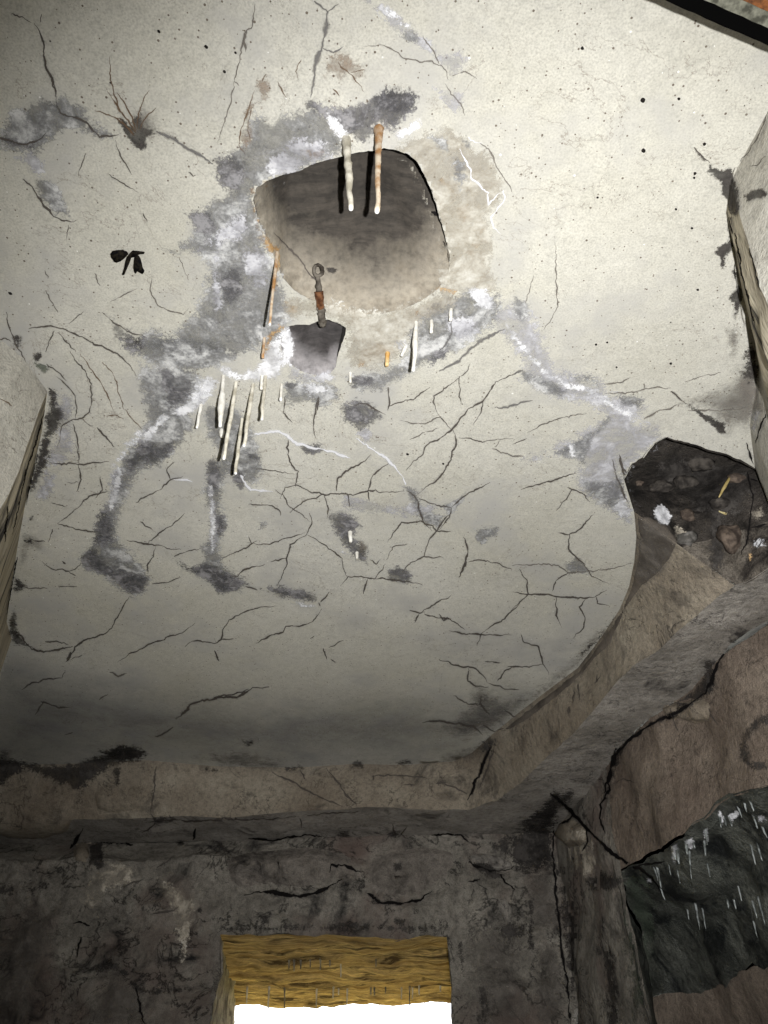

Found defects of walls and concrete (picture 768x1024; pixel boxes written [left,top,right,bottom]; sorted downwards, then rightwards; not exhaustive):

crack [0,13,147,220]
crack [156,1,477,176]
crack [23,179,76,238]
spalling [253,148,450,375]
water stain [78,90,686,599]
crack [0,272,186,735]
water stain [260,585,315,607]
crack [99,321,627,737]
spalling [623,437,756,509]
crack [245,863,432,905]
water stain [671,830,709,862]